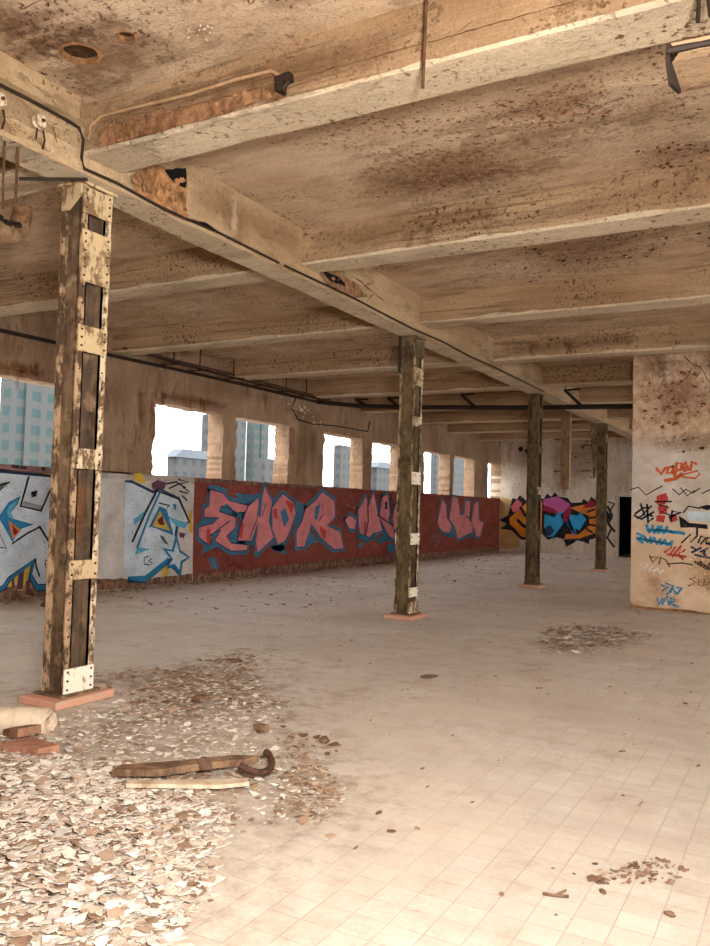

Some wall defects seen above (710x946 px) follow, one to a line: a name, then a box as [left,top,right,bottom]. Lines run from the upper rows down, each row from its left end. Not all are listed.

spalling [98,88,273,148]
spalling [131,165,219,233]
peeling [641,371,710,453]